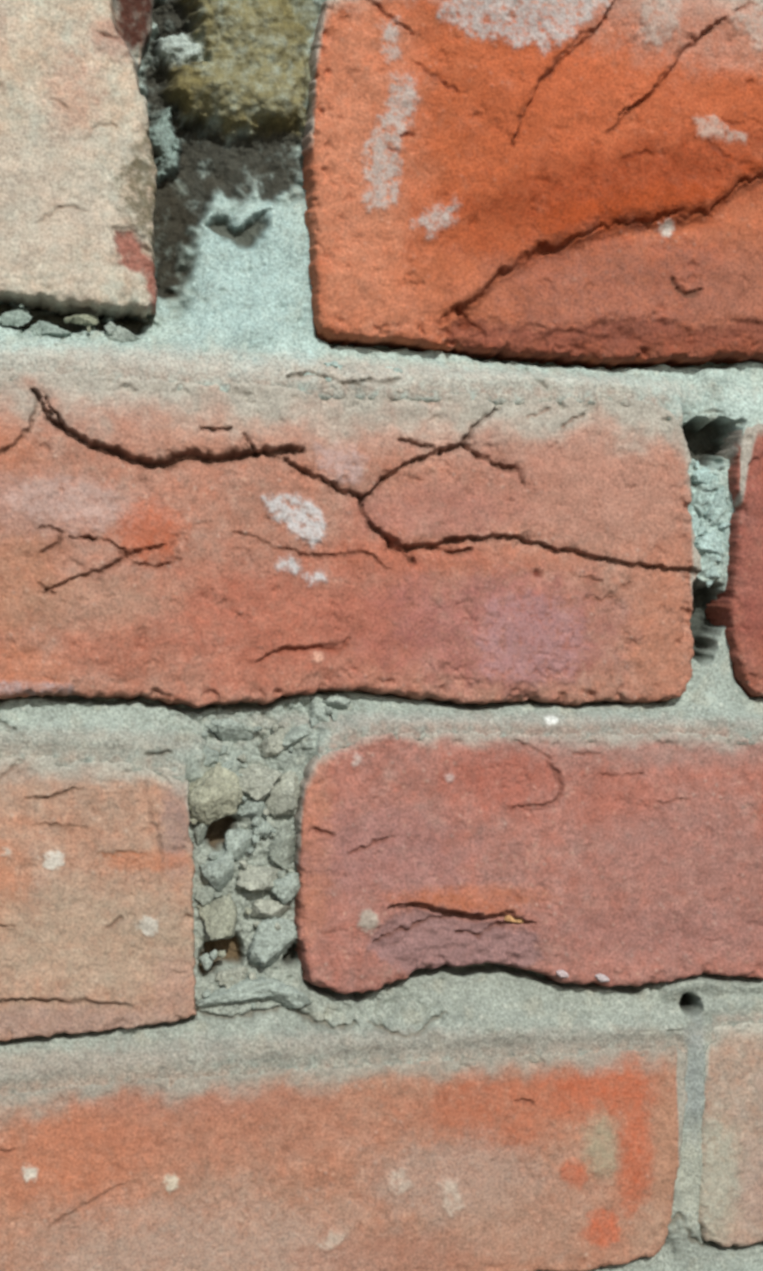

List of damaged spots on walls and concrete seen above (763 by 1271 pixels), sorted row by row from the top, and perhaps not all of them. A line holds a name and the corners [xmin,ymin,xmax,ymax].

crack [364,0,461,95]
crack [511,0,619,147]
crack [605,0,759,138]
crack [433,117,763,333]
crack [0,366,718,604]
crack [697,407,726,416]
spalling [682,415,747,667]
spalling [188,694,360,1010]
spalling [363,906,569,978]